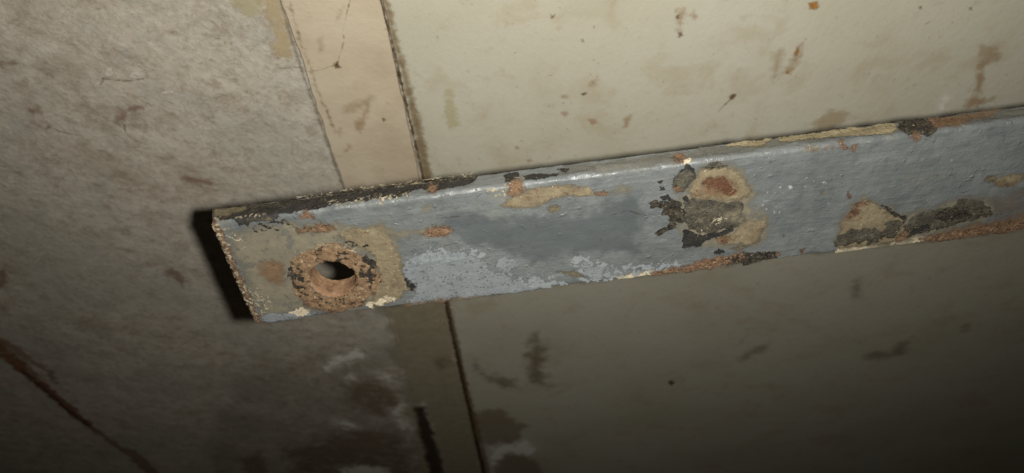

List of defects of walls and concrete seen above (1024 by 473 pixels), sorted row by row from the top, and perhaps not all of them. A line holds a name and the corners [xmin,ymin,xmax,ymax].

corrosion [261,210,383,314]
corrosion [423,225,453,237]
peeling [212,176,680,323]
peeling [501,168,594,209]
corrosion [649,153,780,276]
peeling [679,166,768,254]
peeling [833,197,995,249]
corrosion [918,213,1024,243]